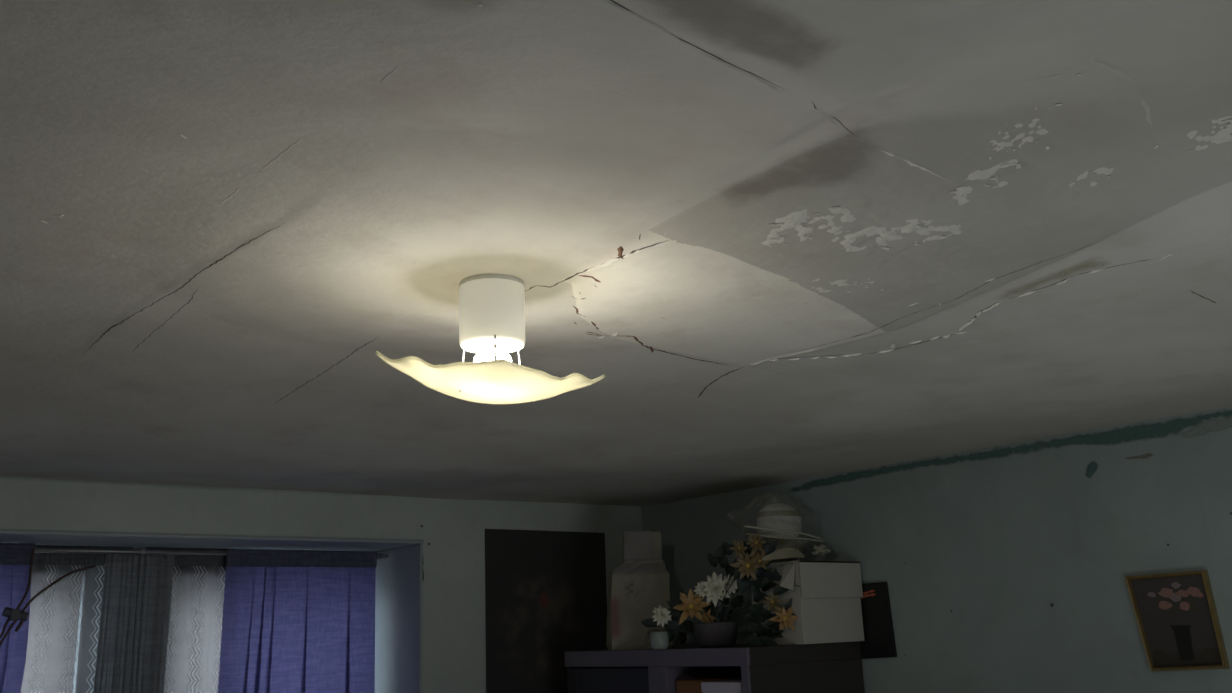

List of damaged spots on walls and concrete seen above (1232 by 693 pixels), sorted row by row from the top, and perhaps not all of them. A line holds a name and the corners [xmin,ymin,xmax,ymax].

crack [606,0,781,91]
peeling [949,107,1049,206]
peeling [1187,116,1232,152]
peeling [761,207,961,252]
crack [84,224,282,353]
crack [524,240,1201,398]